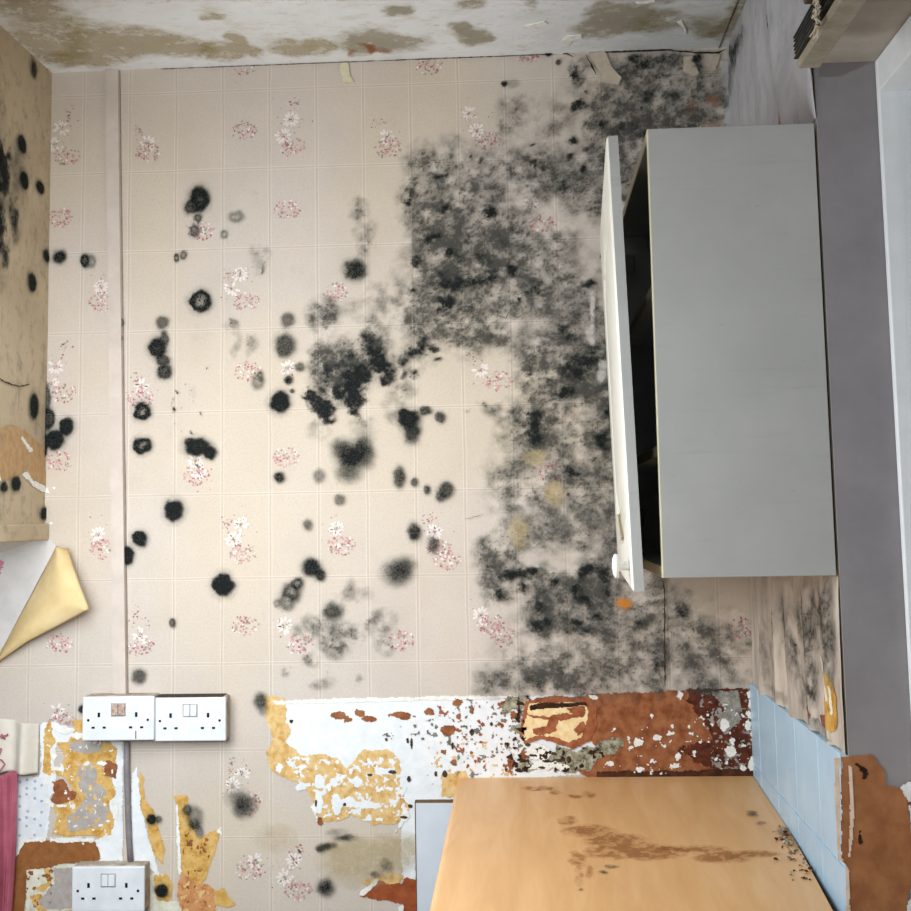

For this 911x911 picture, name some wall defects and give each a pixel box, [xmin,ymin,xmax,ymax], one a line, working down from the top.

damp [0,134,45,267]
damp [184,186,210,237]
damp [147,317,171,379]
flaking render [0,425,46,492]
damp [184,431,217,460]
damp [269,53,735,774]
damp [164,500,183,522]
damp [124,531,147,565]
damp [211,573,235,596]
flaking render [12,740,118,911]
flaking render [276,688,754,911]
flaking render [834,754,911,911]